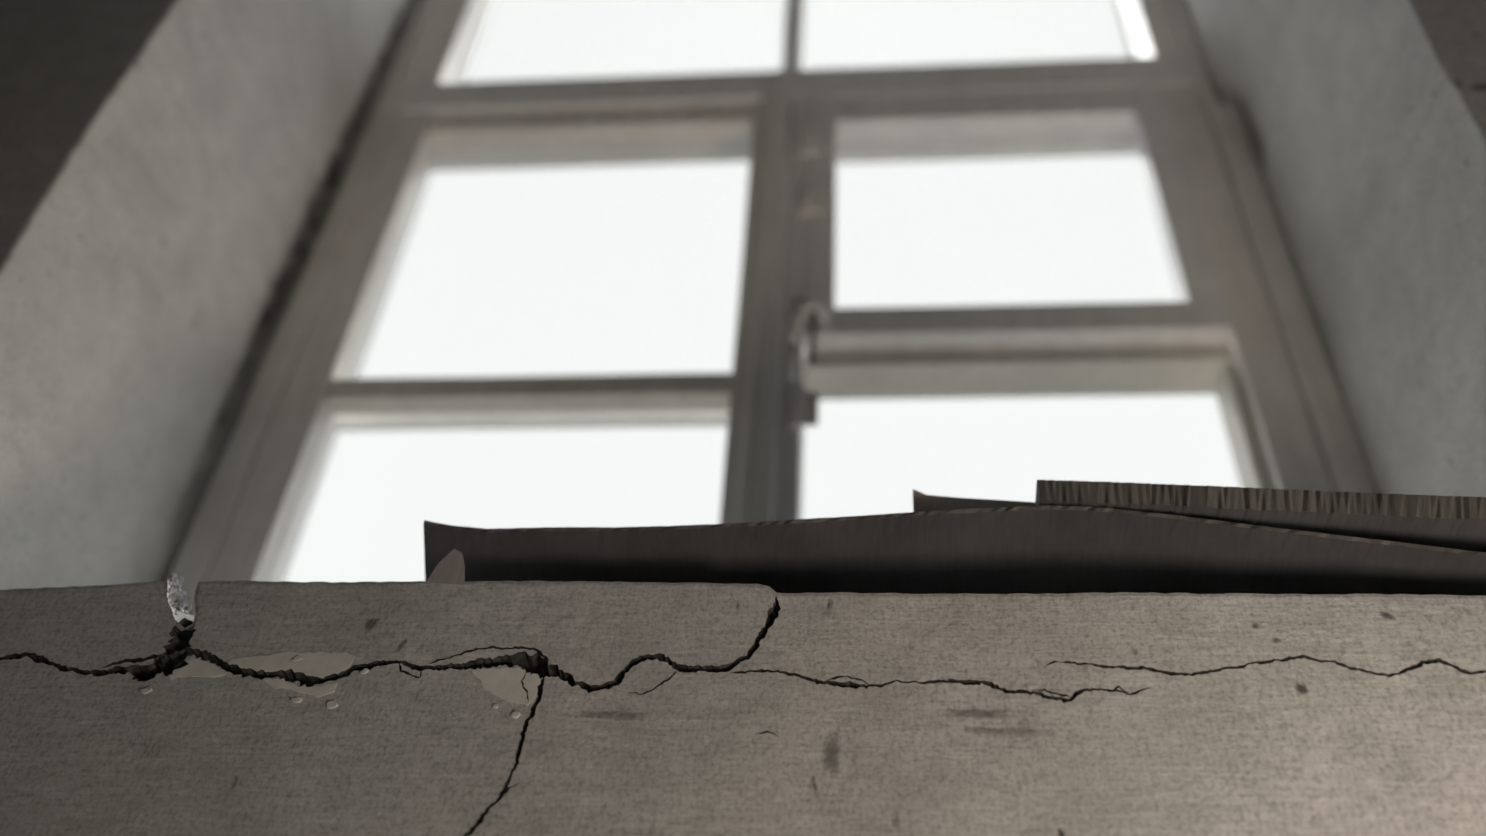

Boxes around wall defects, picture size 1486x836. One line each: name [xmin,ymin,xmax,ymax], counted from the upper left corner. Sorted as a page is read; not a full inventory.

crack [0,596,1486,836]